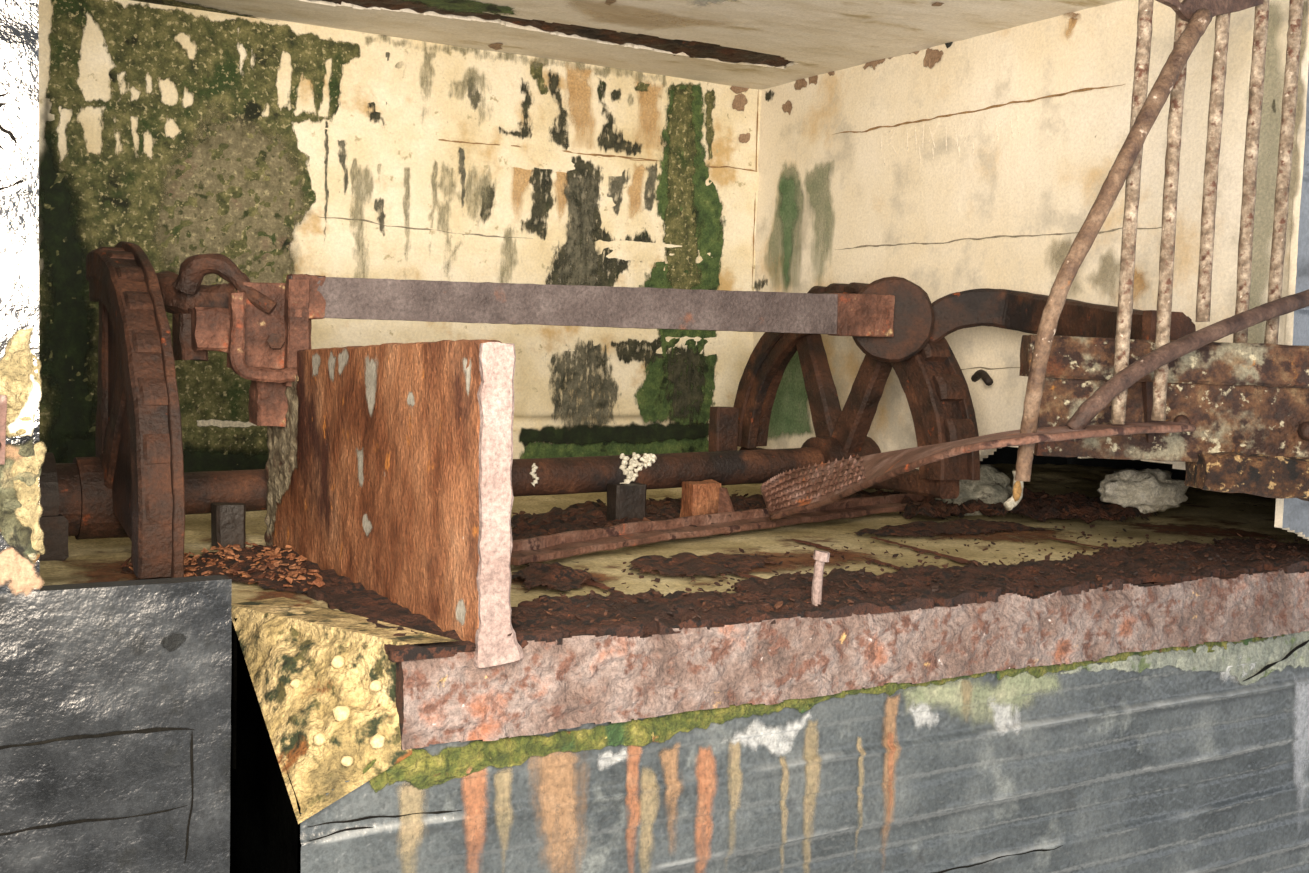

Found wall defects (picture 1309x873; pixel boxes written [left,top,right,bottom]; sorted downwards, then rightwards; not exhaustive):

crack [0,93,17,150]
damp [534,58,665,138]
crack [832,84,1125,135]
damp [501,156,657,287]
damp [550,336,663,428]
spalling [0,328,46,595]
corrosion [507,481,1309,636]
crack [1243,640,1309,681]
crack [0,727,194,861]
corrosion [464,768,511,856]
corrosion [538,751,577,873]
corrosion [627,745,681,867]